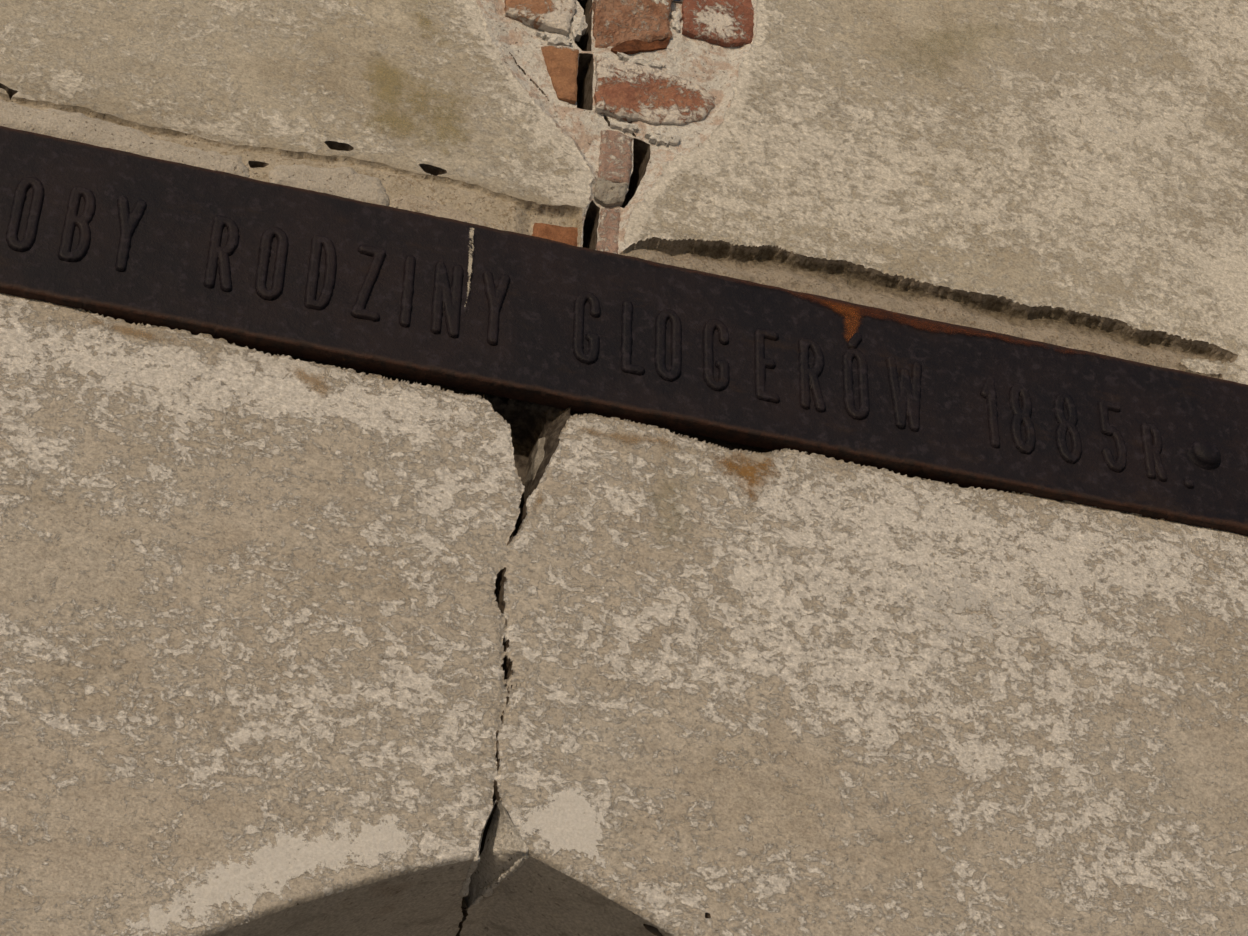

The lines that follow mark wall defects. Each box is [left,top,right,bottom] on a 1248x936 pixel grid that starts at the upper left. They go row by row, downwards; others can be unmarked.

crack [504,0,651,250]
spalling [0,0,1238,379]
corrosion [789,291,1039,345]
crack [487,488,532,822]
crack [456,898,468,936]